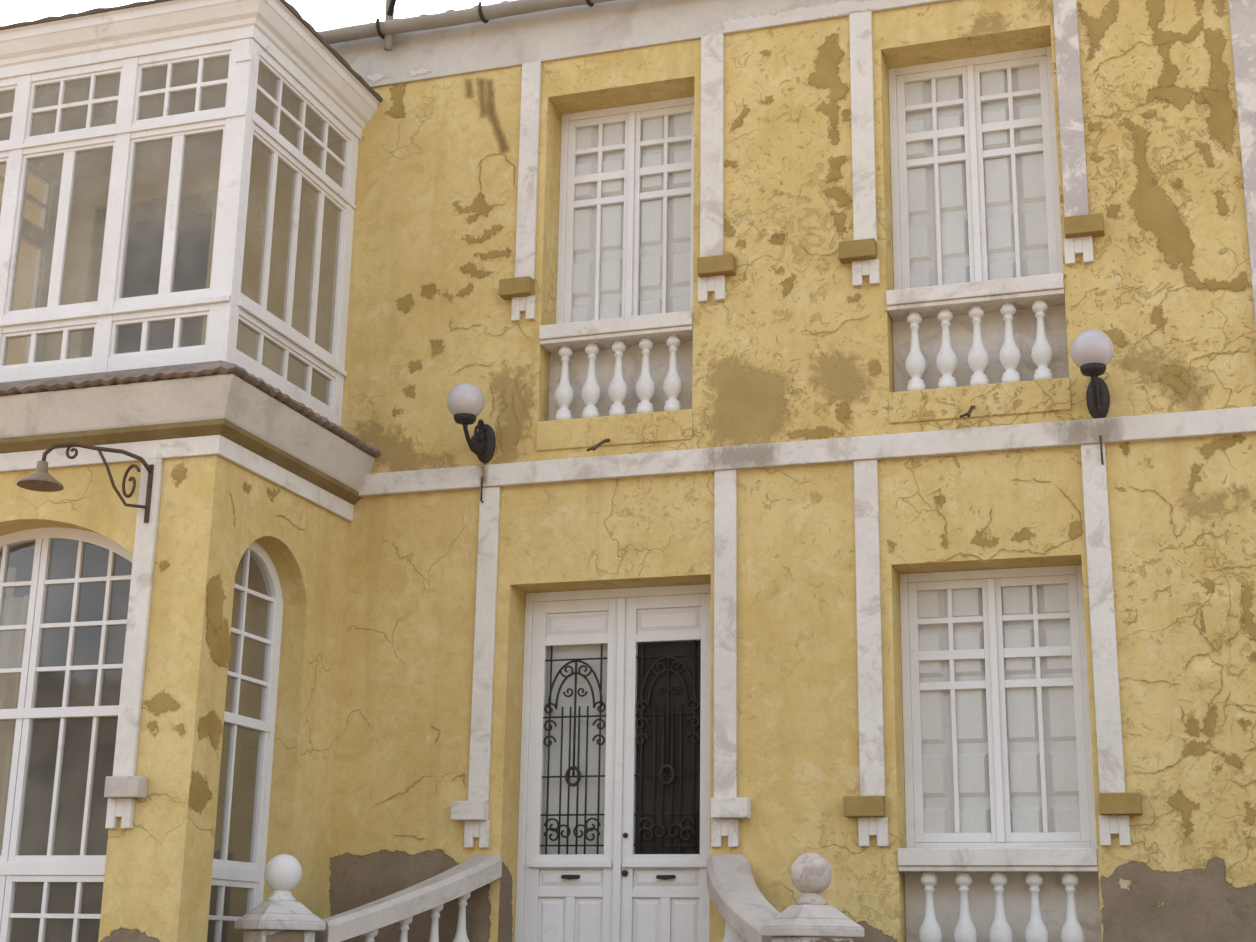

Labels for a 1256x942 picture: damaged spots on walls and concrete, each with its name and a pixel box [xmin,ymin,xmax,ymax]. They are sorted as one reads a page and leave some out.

peeling [1077,0,1118,62]
peeling [808,33,852,235]
peeling [1105,0,1251,292]
peeling [396,193,512,313]
crack [898,478,1082,567]
crack [1116,486,1224,549]
peeling [206,574,233,667]
crack [1120,564,1256,787]
peeling [189,771,213,814]
peeling [101,928,160,942]
peeling [810,921,898,942]
peeling [1100,857,1256,942]